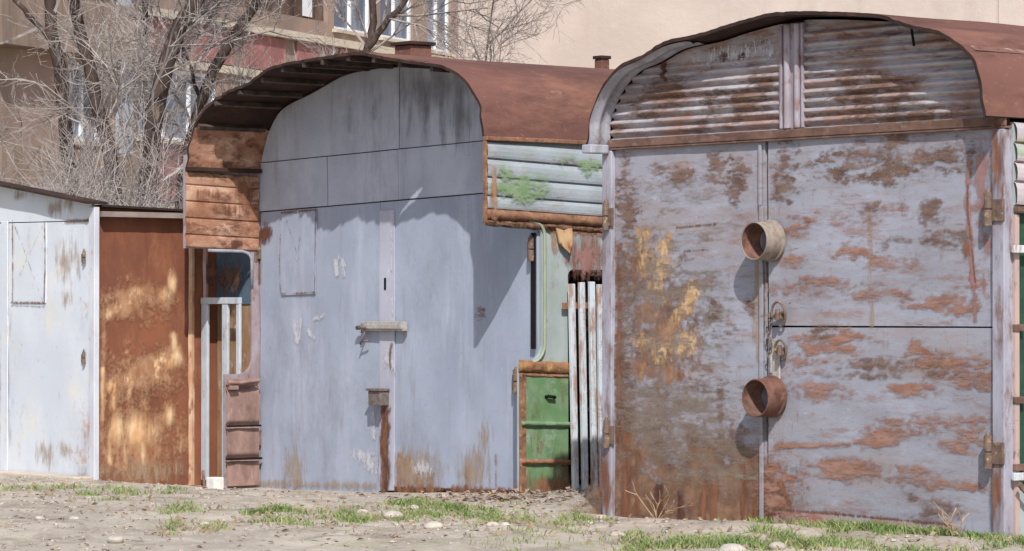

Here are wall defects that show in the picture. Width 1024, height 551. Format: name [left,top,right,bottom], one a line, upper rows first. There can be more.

corrosion [630,61,688,121]
corrosion [704,76,777,116]
corrosion [573,151,1001,527]
corrosion [259,405,568,493]